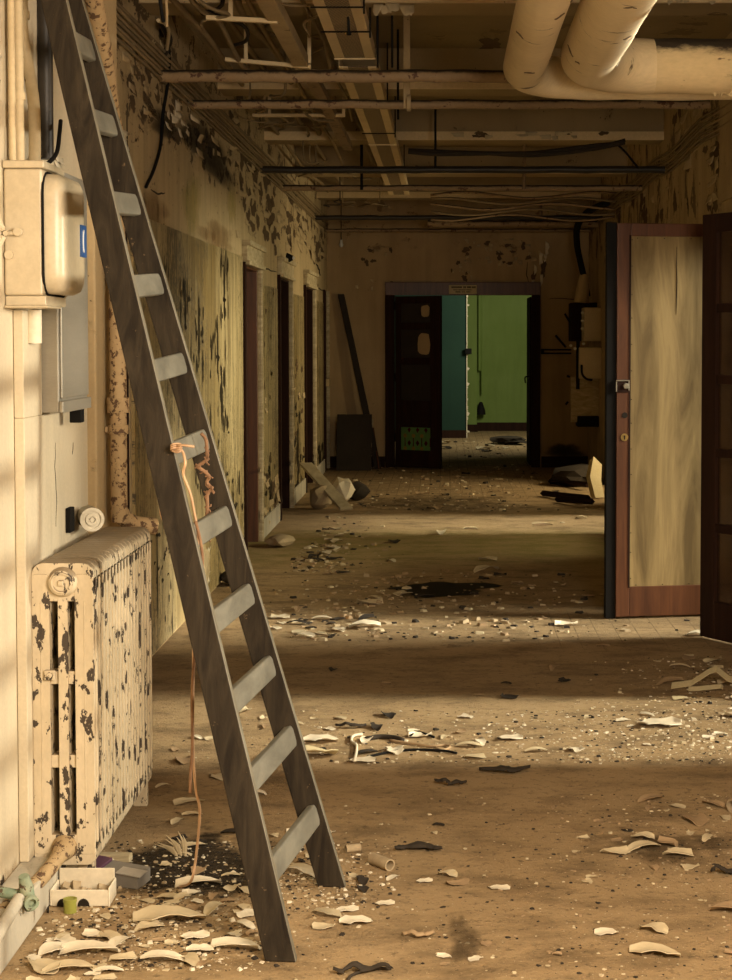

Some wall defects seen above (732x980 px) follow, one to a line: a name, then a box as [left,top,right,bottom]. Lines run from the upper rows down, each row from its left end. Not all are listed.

peeling [117,42,327,264]